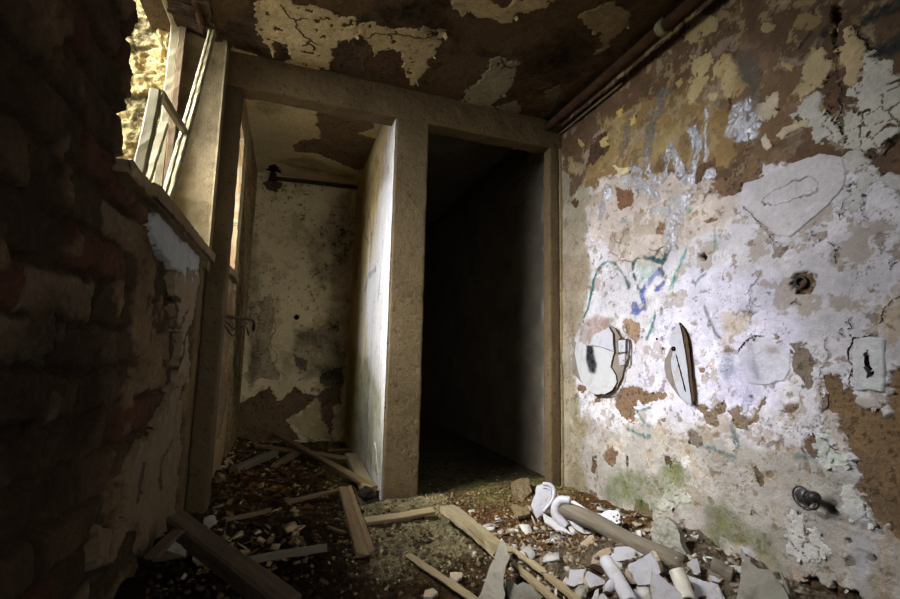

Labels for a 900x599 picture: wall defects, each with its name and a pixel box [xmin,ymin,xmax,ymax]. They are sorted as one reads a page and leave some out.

crack [280,5,320,51]
flaking render [292,112,376,172]
peeling [253,0,448,86]
crack [364,32,436,42]
peeling [645,13,748,105]
peeling [694,7,900,214]
crack [820,23,900,151]
flaking render [603,187,634,212]
flaking render [237,292,345,443]
flaking render [614,385,667,424]
flaking render [693,385,766,432]
flaking render [789,341,900,539]